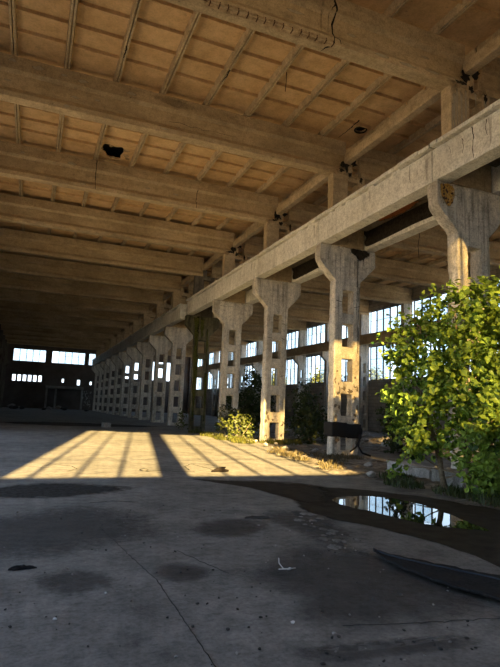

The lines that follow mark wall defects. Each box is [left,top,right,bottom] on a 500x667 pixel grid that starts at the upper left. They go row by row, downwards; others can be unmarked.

crack [321,0,341,51]
spalling [447,70,488,104]
rust [440,183,458,225]
crack [100,527,216,667]